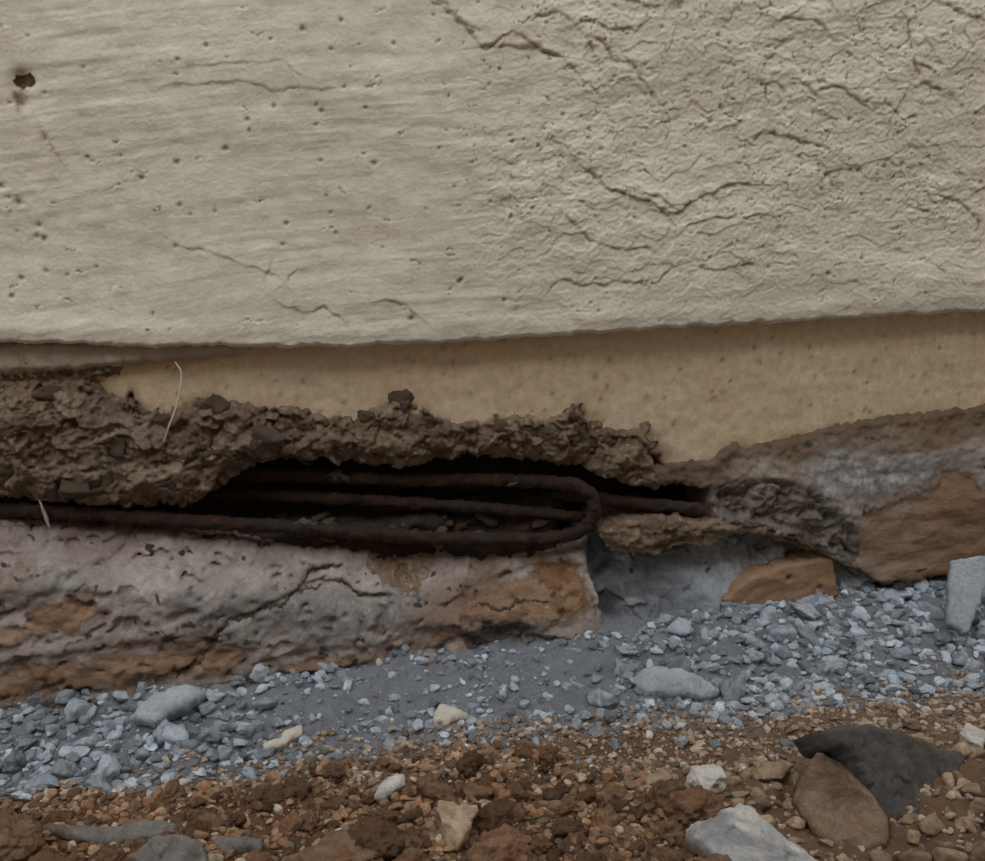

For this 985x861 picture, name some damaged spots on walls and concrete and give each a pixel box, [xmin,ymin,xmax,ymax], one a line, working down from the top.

spalling [0,362,661,508]
peeling [0,595,104,648]
peeling [0,642,244,701]
crack [176,565,390,678]
spalling [280,473,985,674]